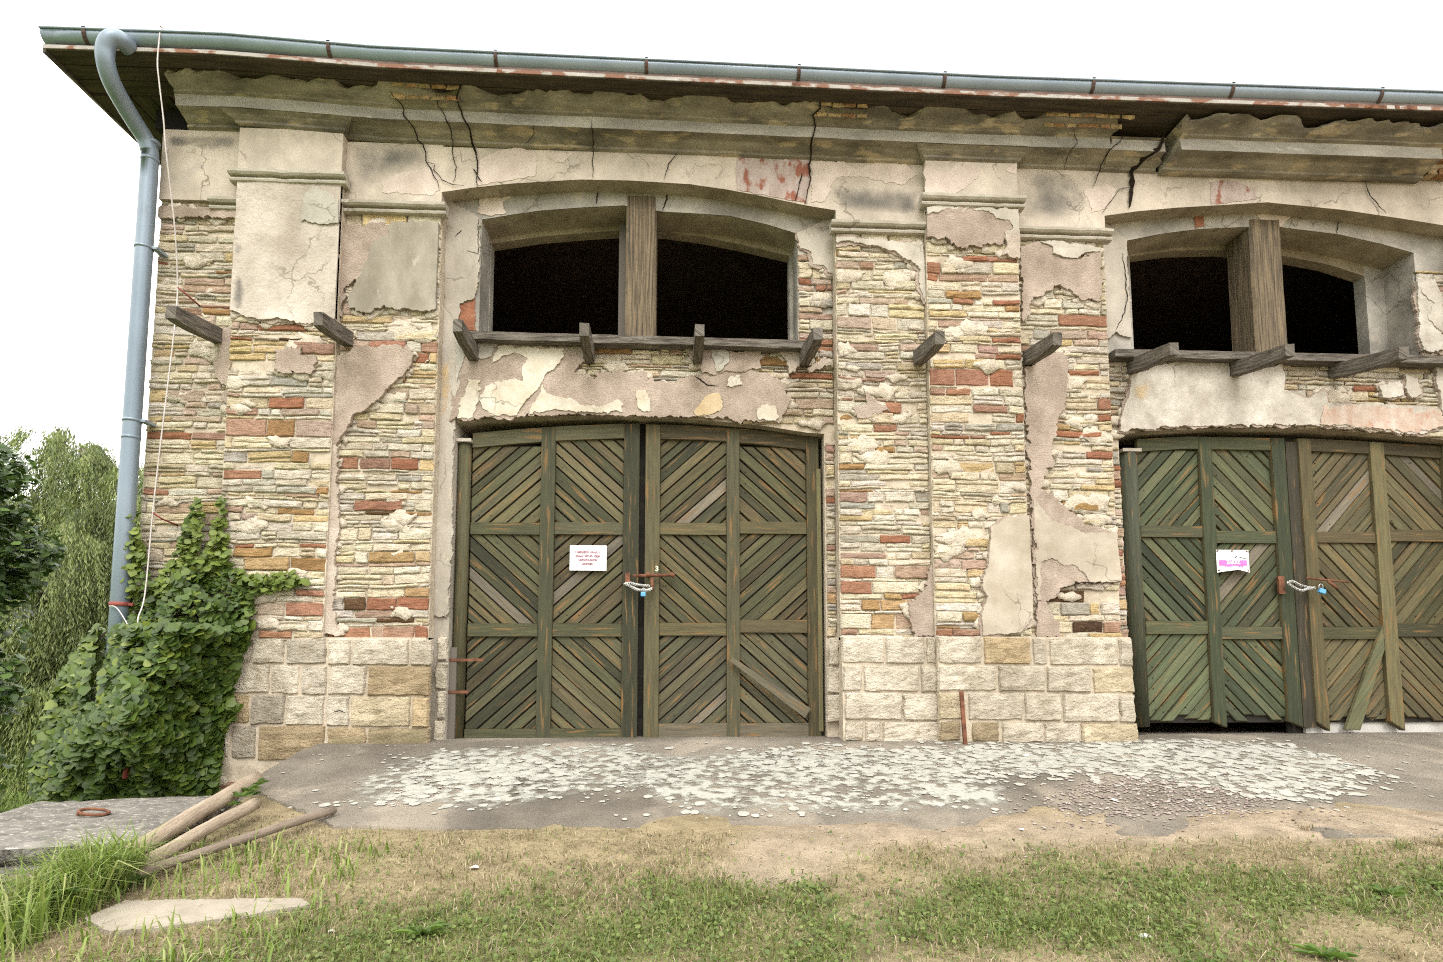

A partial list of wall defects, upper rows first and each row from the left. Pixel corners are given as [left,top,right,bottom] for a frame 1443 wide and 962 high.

peeling [158,181,440,404]
crack [390,86,482,254]
peeling [449,299,832,425]
crack [795,102,821,203]
peeling [736,158,1103,322]
crack [1064,127,1165,213]
spalling [1194,180,1291,228]
peeling [1117,279,1443,438]
spalling [1421,149,1443,181]
peeling [324,344,417,636]
peeling [978,351,1122,637]